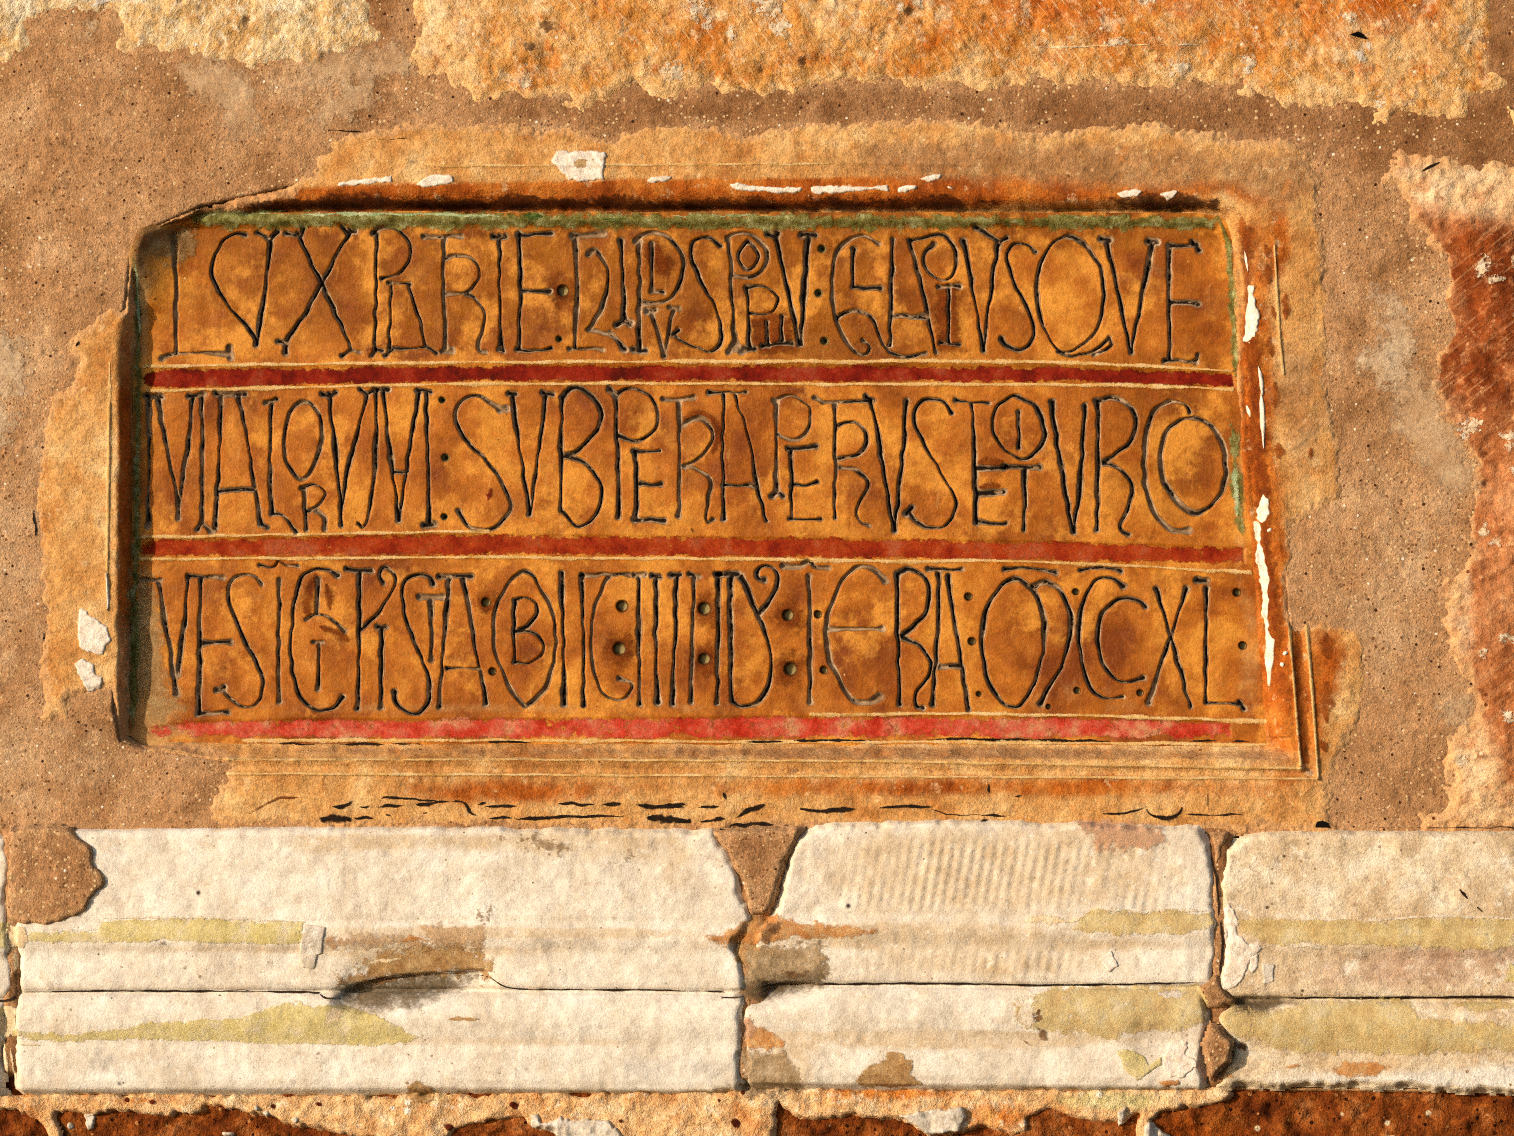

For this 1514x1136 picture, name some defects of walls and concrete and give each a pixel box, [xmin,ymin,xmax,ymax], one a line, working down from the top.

spalling [551,150,607,182]
peeling [730,174,953,195]
peeling [1242,251,1260,343]
peeling [1246,367,1265,448]
peeling [1253,494,1288,686]
peeling [74,572,112,692]
crack [248,784,1021,828]
crack [1103,794,1241,821]
crack [481,975,775,998]
spalling [706,914,876,988]
crack [816,855,1224,987]
spalling [899,1106,967,1136]